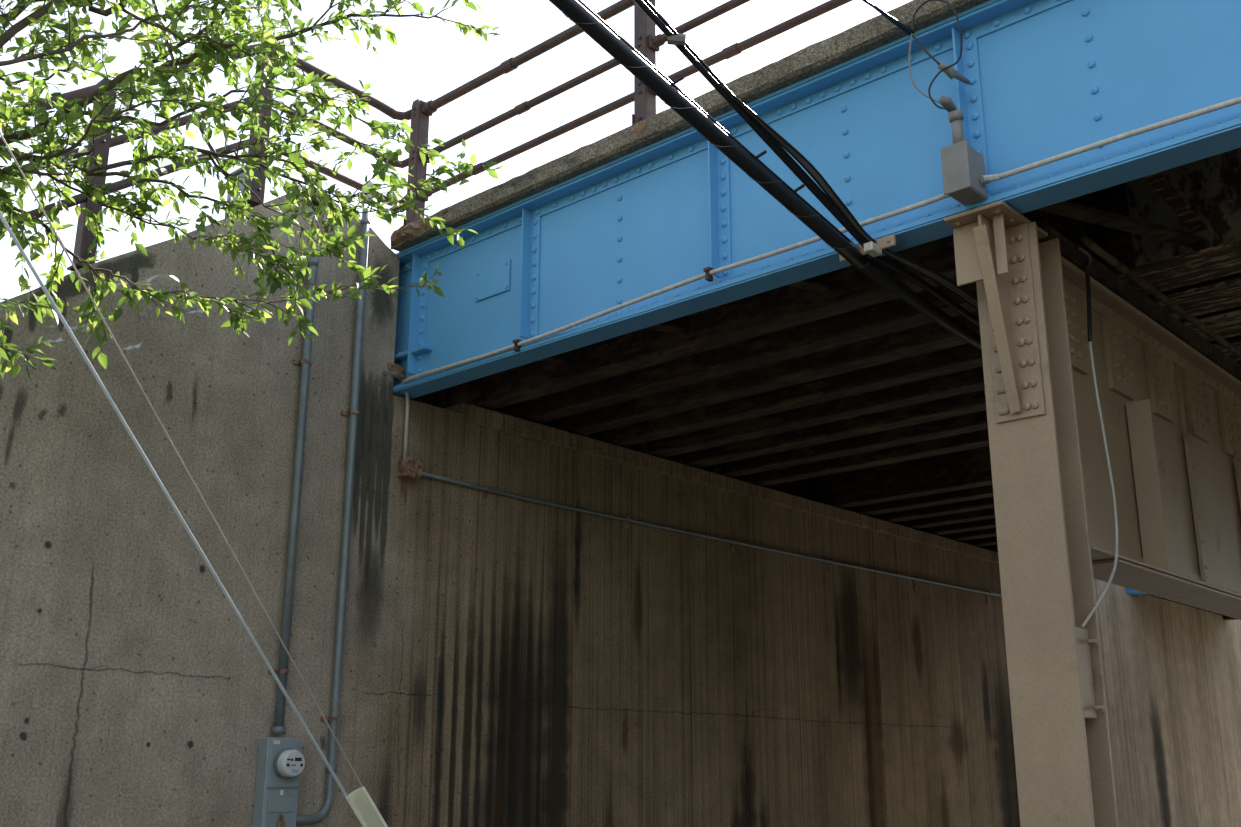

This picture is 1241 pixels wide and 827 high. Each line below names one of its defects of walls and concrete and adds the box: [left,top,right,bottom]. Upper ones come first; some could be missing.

water stain [836,580,875,827]
water stain [984,675,1020,827]